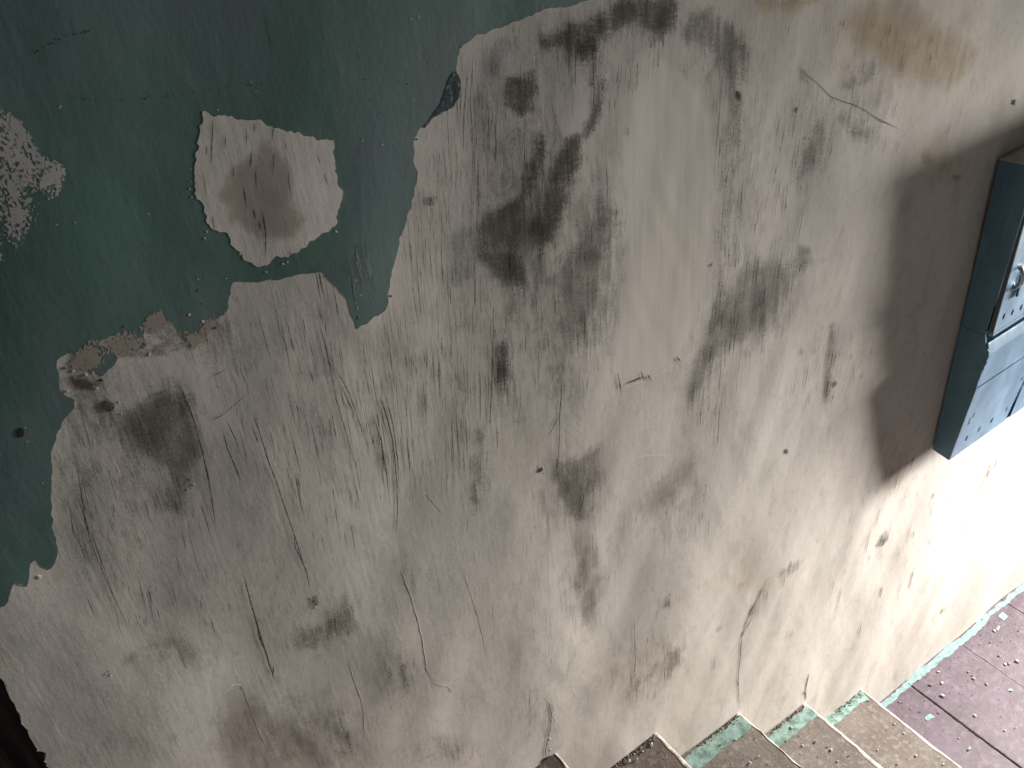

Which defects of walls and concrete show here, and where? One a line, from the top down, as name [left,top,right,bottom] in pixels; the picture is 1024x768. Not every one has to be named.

water stain [478,0,749,290]
crack [805,73,894,127]
peeling [0,0,588,607]
flaking render [0,642,77,768]